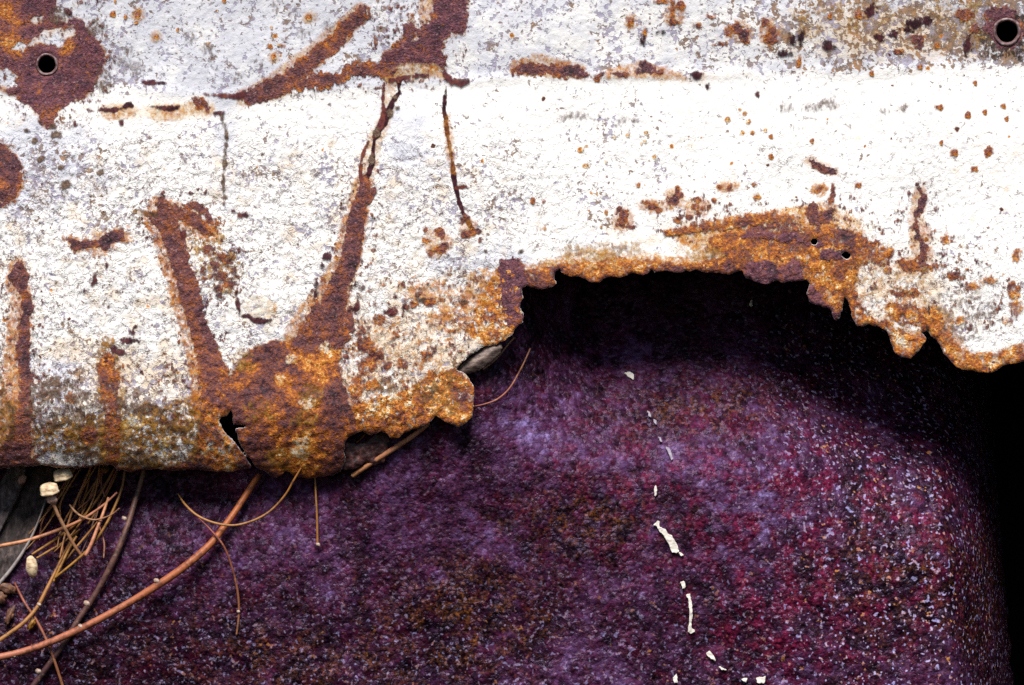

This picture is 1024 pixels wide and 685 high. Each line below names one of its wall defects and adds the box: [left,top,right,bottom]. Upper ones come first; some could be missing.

rust [0,143,26,207]
rust [0,0,152,131]
rust [203,0,470,107]
crack [442,89,482,242]
rust [725,108,773,139]
rust [971,145,993,172]
rust [0,243,50,463]
rust [64,157,1024,478]